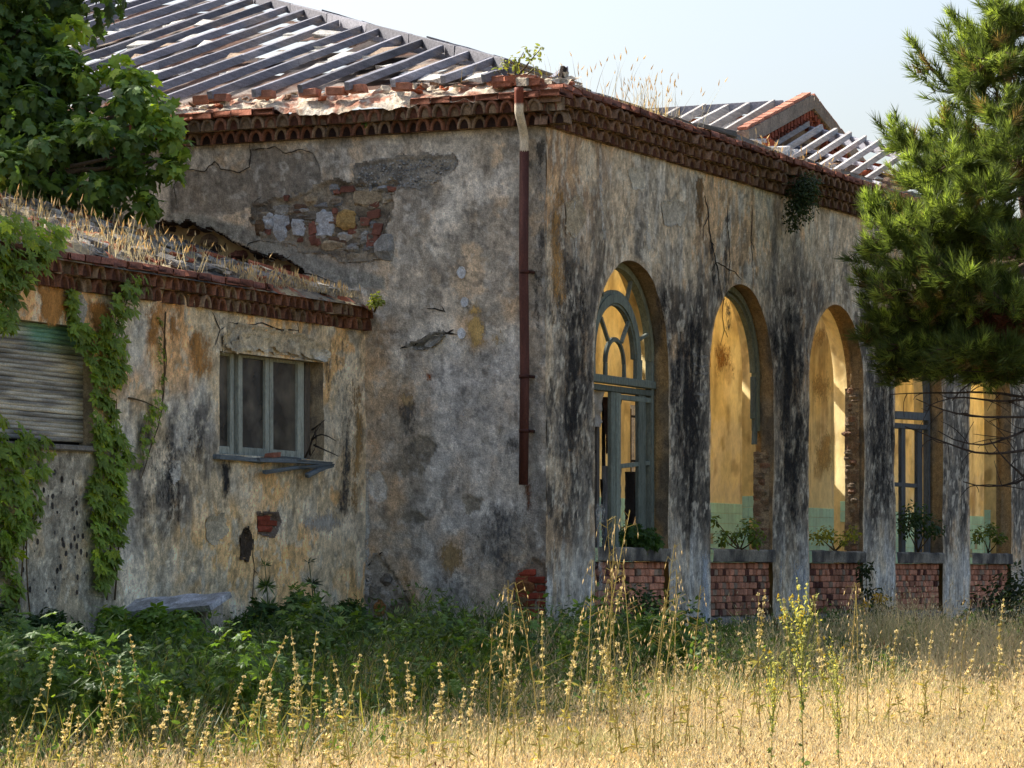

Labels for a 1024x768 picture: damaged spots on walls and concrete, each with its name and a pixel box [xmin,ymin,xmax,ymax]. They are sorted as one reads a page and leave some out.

spalling [155,143,458,274]
leakage [536,140,545,194]
crack [703,197,754,345]
leakage [145,427,203,522]
leakage [222,462,230,496]
peeling [205,510,282,562]
spalling [509,557,547,625]
leakage [535,190,594,508]
leakage [655,292,709,539]
leakage [770,288,832,529]
leakage [867,349,895,513]